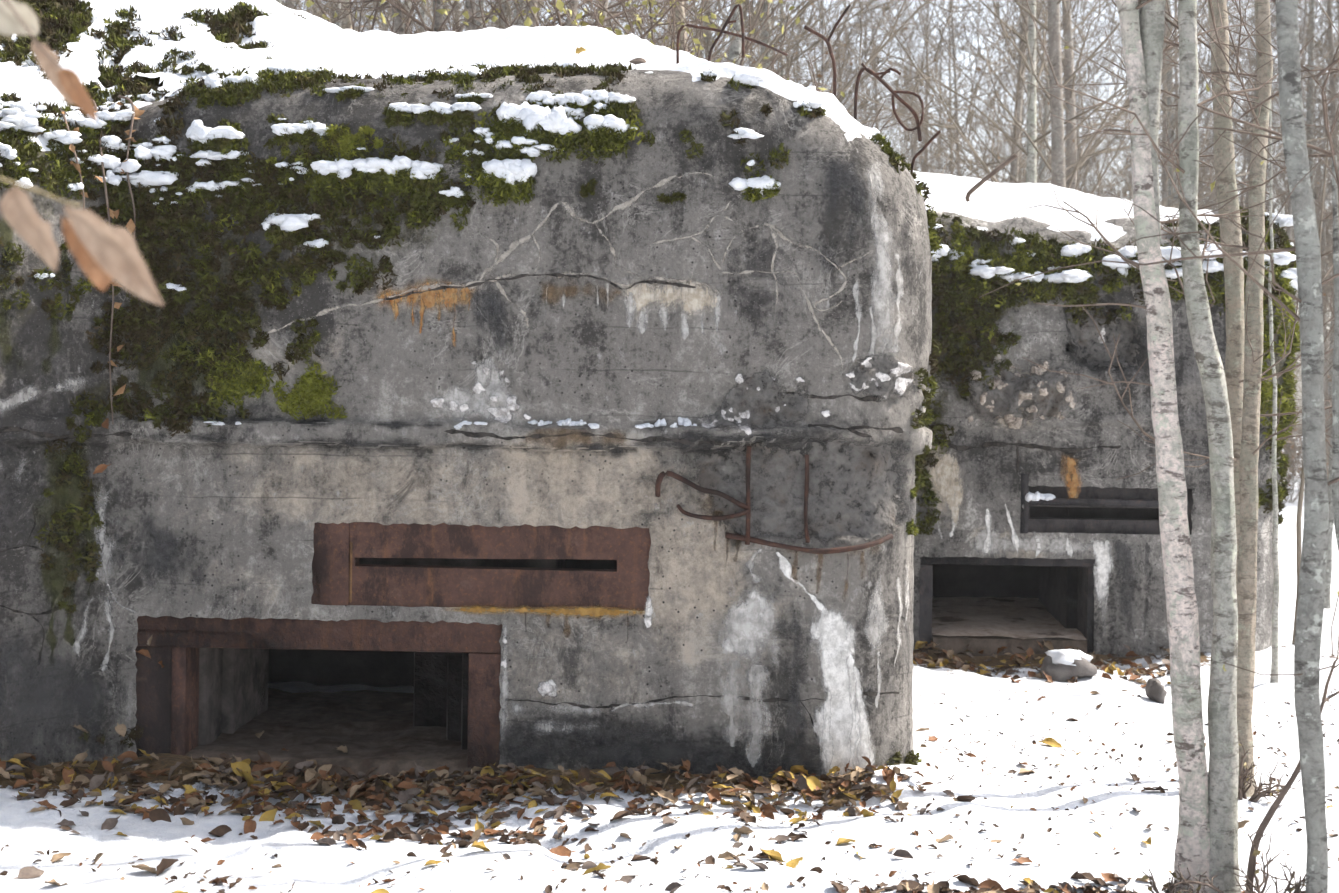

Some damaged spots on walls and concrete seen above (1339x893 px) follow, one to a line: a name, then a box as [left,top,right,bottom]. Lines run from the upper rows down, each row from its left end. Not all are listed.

rust [377,281,473,347]
crack [268,172,904,437]
efflorescence [627,281,720,339]
crack [444,429,727,446]
crack [935,442,1121,473]
rust [1063,456,1080,499]
rust [703,495,741,562]
leakage [508,549,909,776]
crack [505,695,822,738]
crack [855,690,899,698]